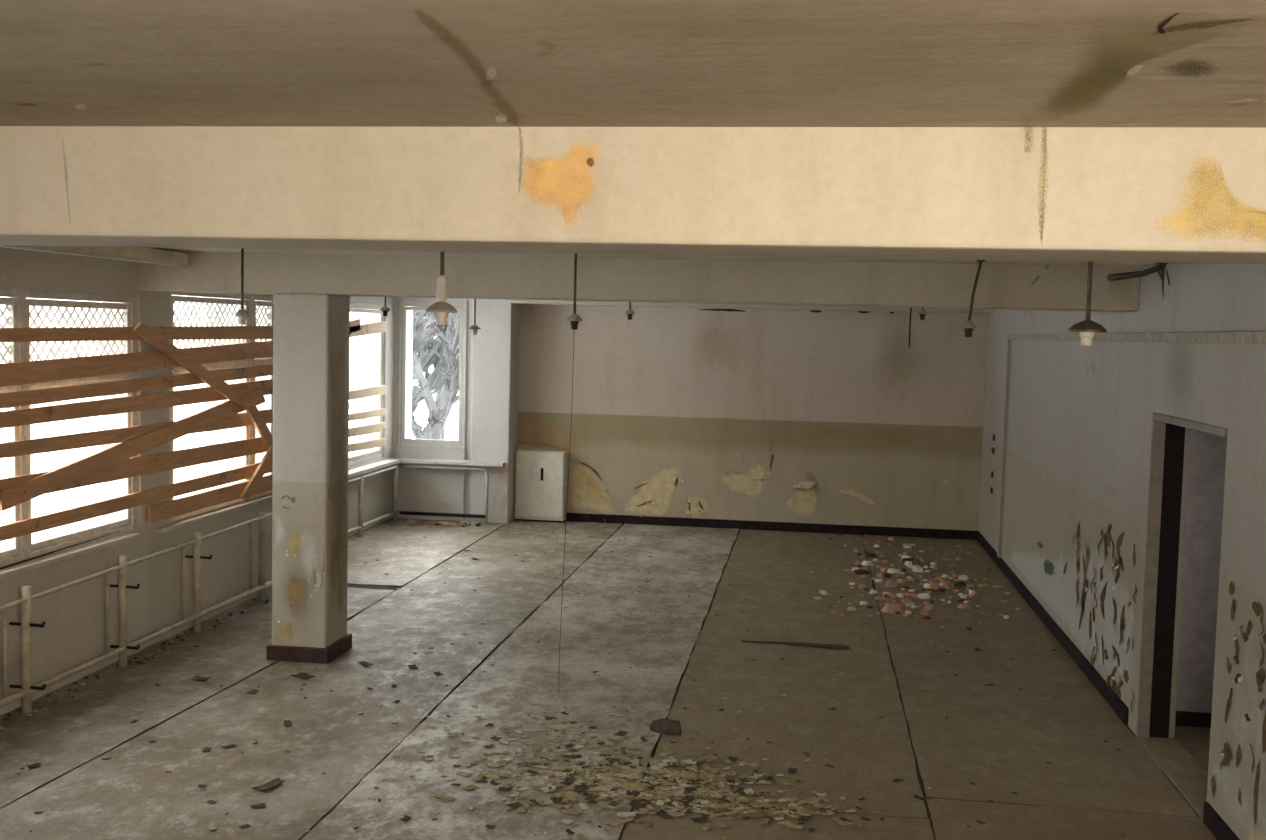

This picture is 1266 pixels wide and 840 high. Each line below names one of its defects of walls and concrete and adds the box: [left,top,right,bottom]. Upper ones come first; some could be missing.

spalling [570,459,709,521]
peeling [1037,521,1137,712]
peeling [1211,581,1266,825]